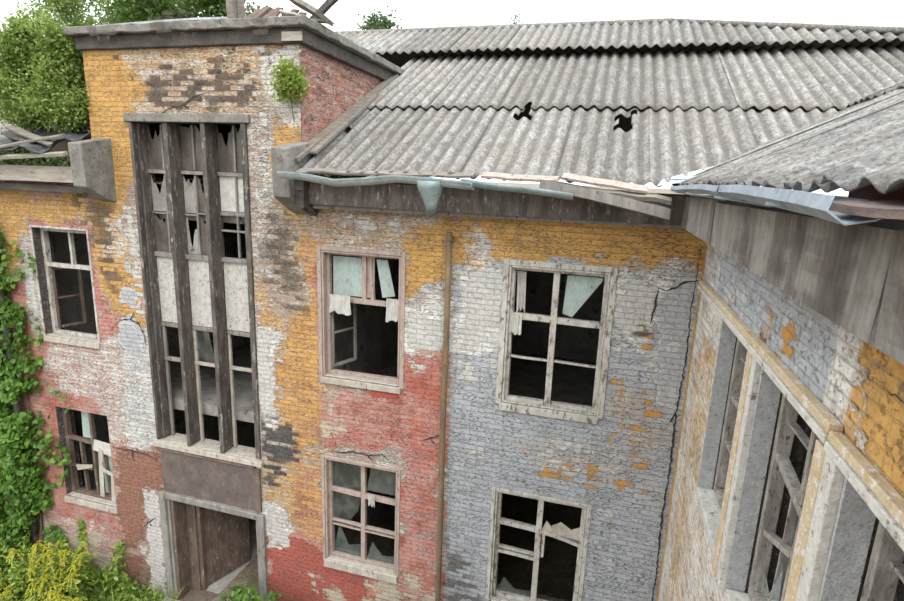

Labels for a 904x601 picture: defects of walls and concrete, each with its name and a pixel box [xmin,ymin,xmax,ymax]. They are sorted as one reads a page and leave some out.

spalling [144,57,266,114]
peeling [261,45,301,69]
spalling [107,204,146,362]
peeling [404,239,503,386]
peeling [257,328,289,420]
peeling [606,262,701,471]
water stain [260,418,301,487]
peeling [534,428,599,490]
crack [650,247,702,601]
spalling [42,446,168,598]
peeling [267,510,292,550]
peeling [307,570,347,601]